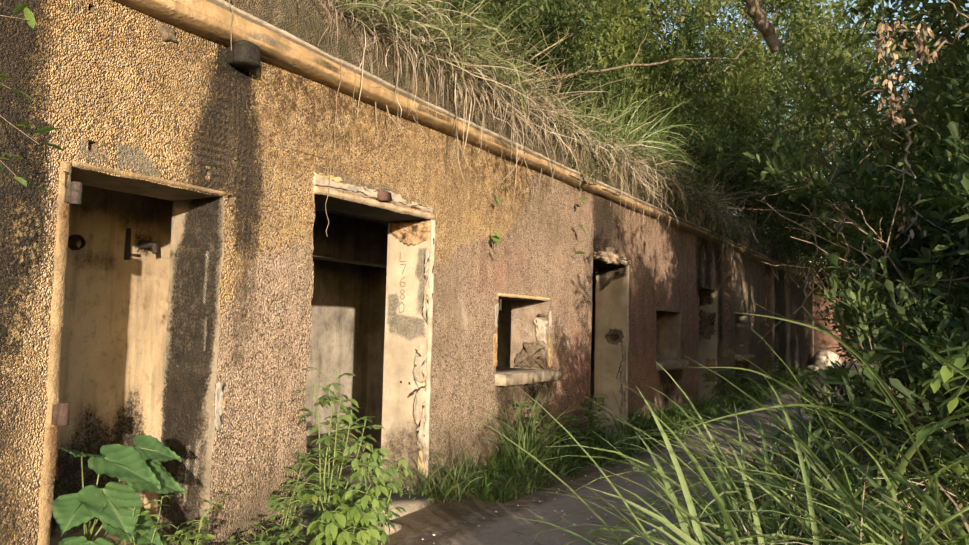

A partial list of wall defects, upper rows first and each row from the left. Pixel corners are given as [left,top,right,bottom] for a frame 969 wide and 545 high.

spalling [314,172,431,209]
leakage [0,0,50,545]
leakage [159,45,262,545]
peeling [388,295,399,322]
spalling [391,220,431,324]
spalling [514,311,555,370]
spalling [605,328,624,345]
leakage [50,392,145,537]
peeling [400,355,427,481]